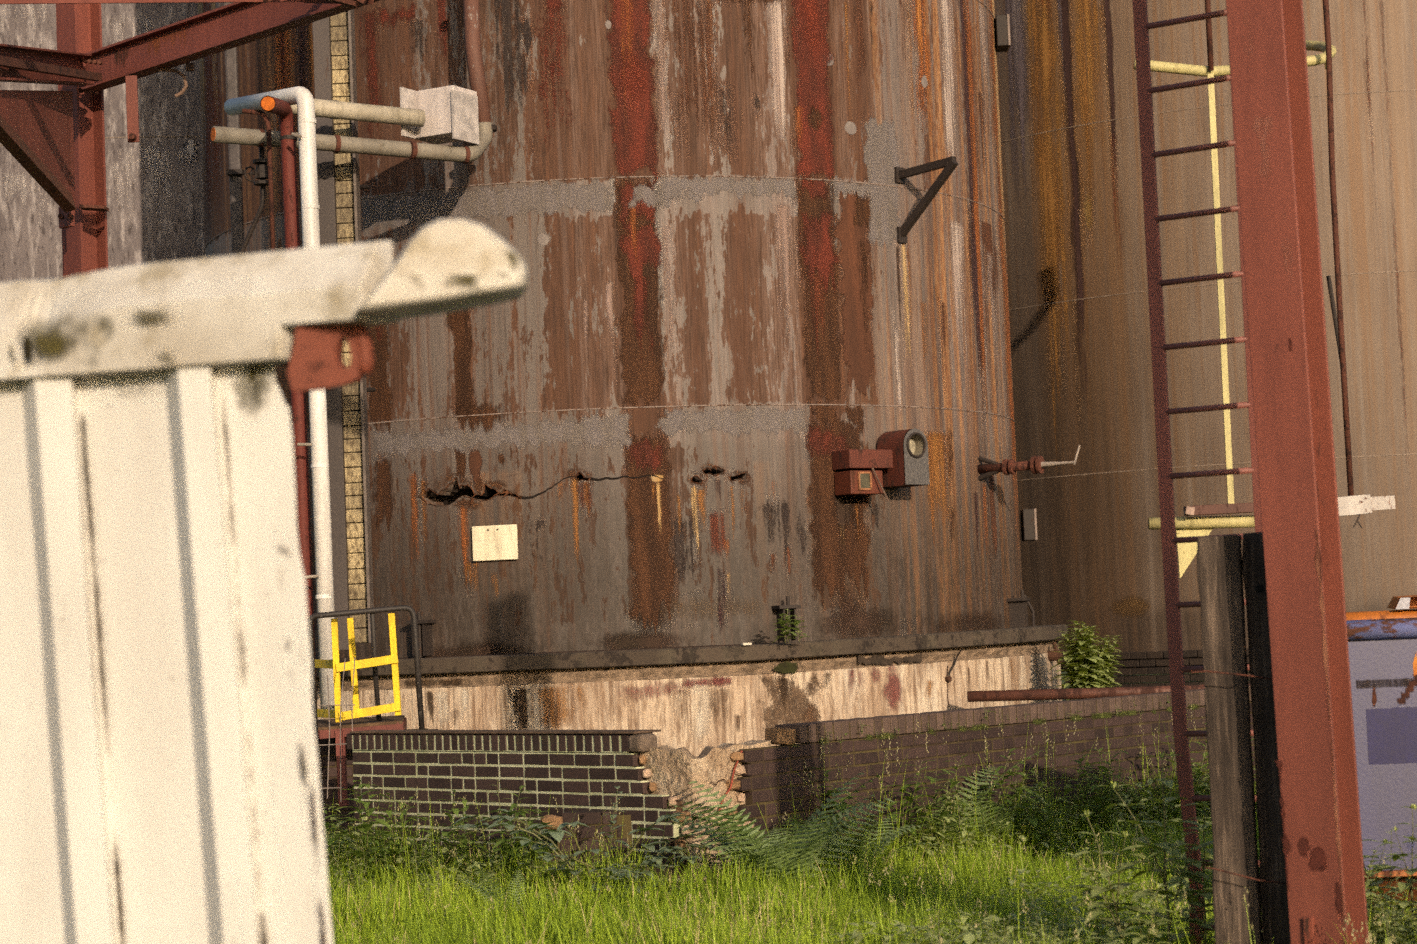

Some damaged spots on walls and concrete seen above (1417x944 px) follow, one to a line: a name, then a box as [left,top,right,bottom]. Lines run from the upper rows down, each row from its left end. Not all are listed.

peeling [673,0,720,128]
peeling [582,0,701,634]
peeling [733,0,879,606]
water stain [508,688,528,730]
water stain [681,685,740,738]